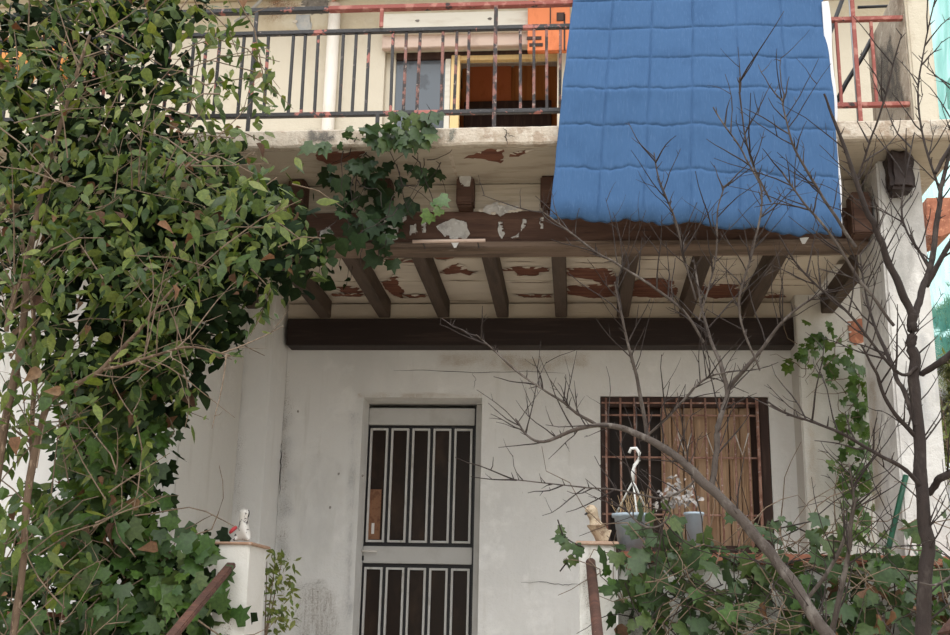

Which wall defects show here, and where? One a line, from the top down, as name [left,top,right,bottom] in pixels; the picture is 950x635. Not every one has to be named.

peeling [464,149,533,163]
peeling [478,202,546,240]
peeling [383,215,479,276]
peeling [328,286,365,299]
peeling [381,274,427,299]
peeling [502,266,552,277]
peeling [566,268,617,298]
peeling [632,278,679,298]
damp [270,371,362,635]